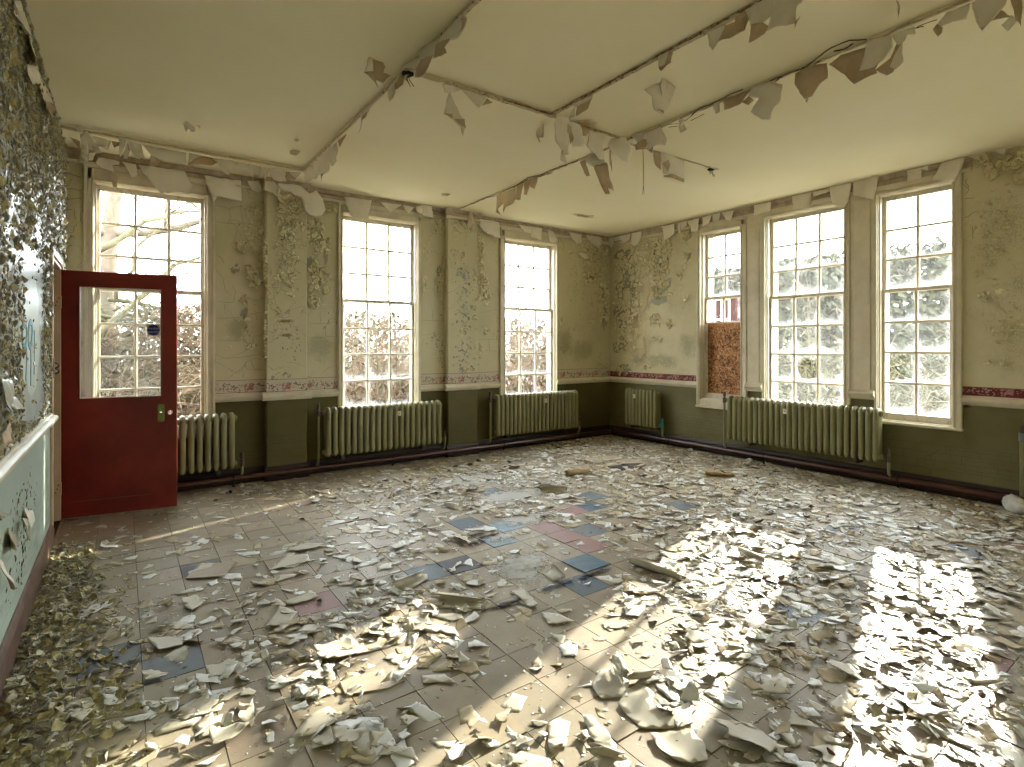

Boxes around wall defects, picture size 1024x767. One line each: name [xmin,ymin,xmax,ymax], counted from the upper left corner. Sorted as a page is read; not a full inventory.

peeling [364,15,467,101]
peeling [644,51,676,114]
peeling [708,0,803,50]
peeling [712,26,916,120]
peeling [933,0,1023,37]
peeling [0,0,370,457]
peeling [536,95,614,194]
peeling [631,127,685,182]
peeling [792,176,879,210]
peeling [344,176,538,377]
peeling [610,213,720,376]
peeling [0,475,37,603]